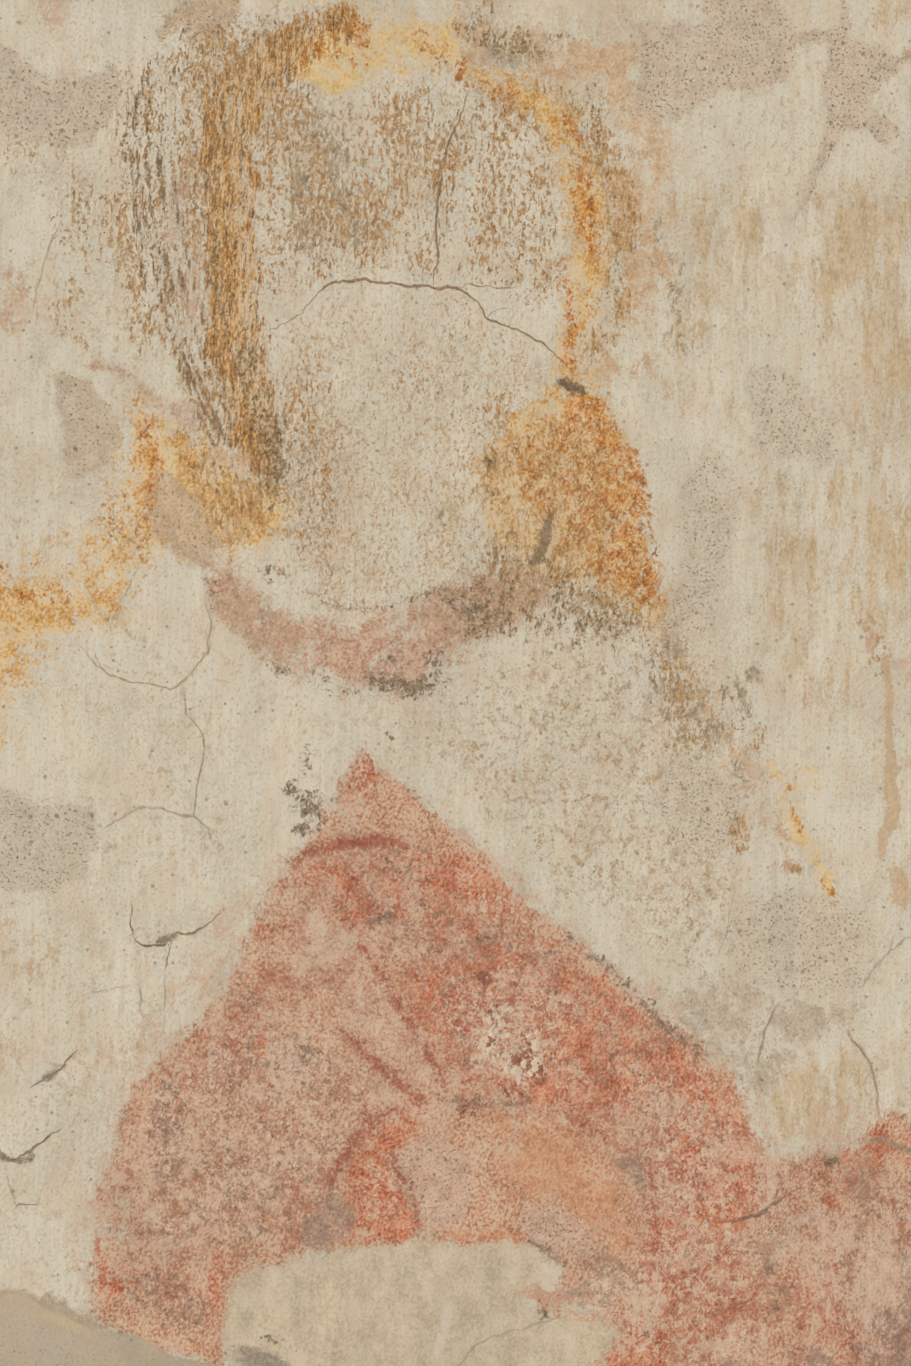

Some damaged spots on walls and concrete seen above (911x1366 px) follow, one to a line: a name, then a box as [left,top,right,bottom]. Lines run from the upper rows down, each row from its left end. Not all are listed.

crack [269,92,572,371]
crack [75,603,214,845]
crack [857,937,911,989]
crack [30,1049,78,1088]
crack [755,1006,776,1070]
crack [848,1032,881,1117]